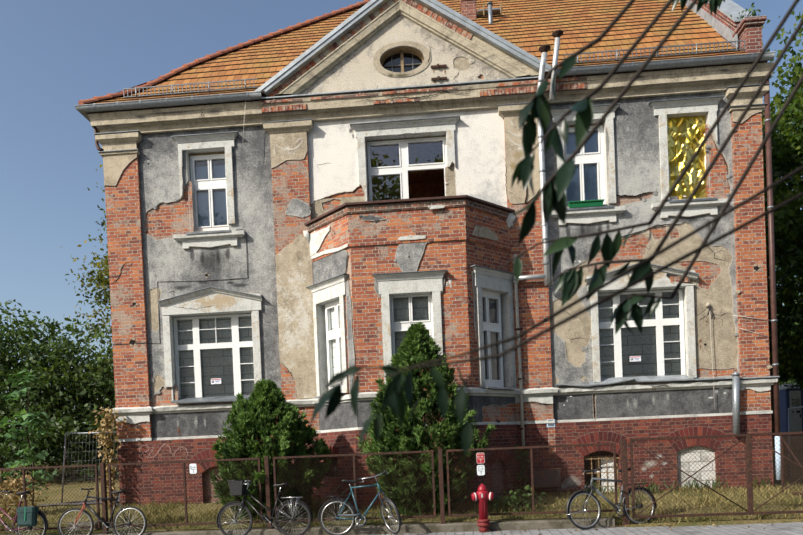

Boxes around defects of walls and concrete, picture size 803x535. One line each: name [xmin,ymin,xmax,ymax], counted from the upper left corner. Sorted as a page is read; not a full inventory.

spalling [453,57,484,79]
spalling [480,76,587,98]
peeling [472,226,498,241]
leakage [191,251,229,267]
spalling [272,151,369,393]
peeling [394,235,430,272]
spalling [483,112,772,423]
spalling [105,158,194,439]
spalling [280,363,298,399]